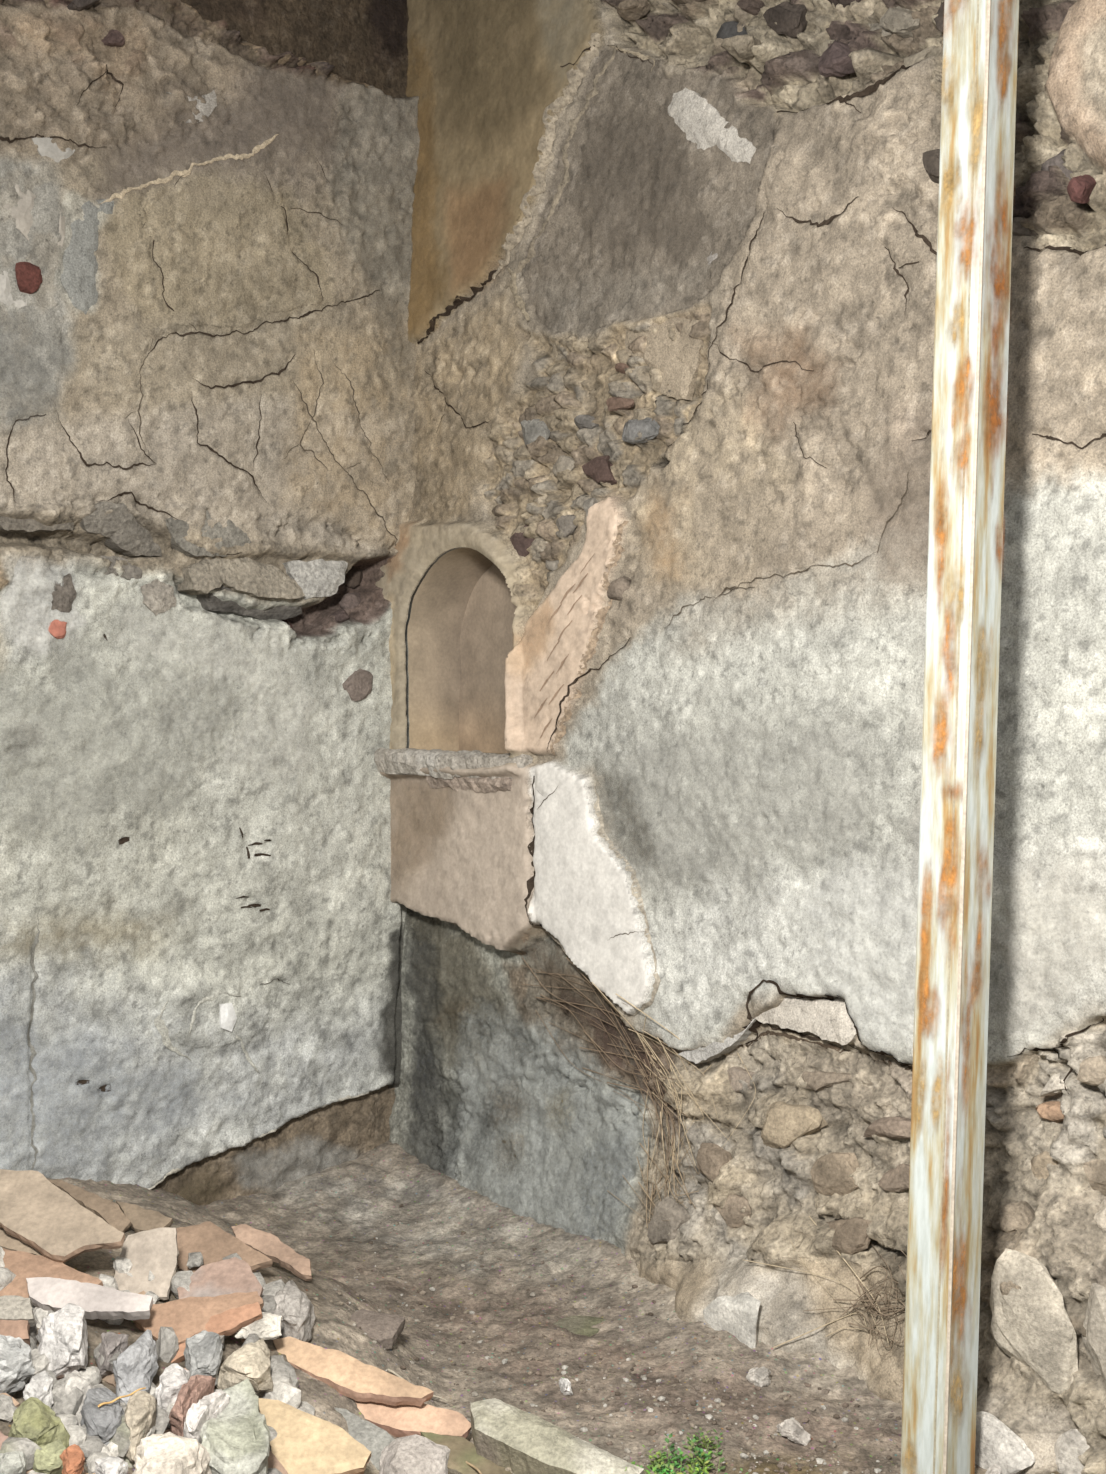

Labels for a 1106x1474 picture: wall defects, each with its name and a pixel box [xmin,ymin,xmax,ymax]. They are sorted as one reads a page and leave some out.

rust [998,0,1012,98]
flaking render [1012,0,1106,252]
crack [5,163,398,546]
spalling [482,0,944,614]
crack [668,196,859,447]
rust [955,358,1002,449]
rust [933,494,964,759]
flaking render [629,1030,913,1296]
crack [742,979,913,1065]
rust [919,822,958,1031]
flaking render [975,1026,1106,1474]
crack [1009,1018,1104,1094]